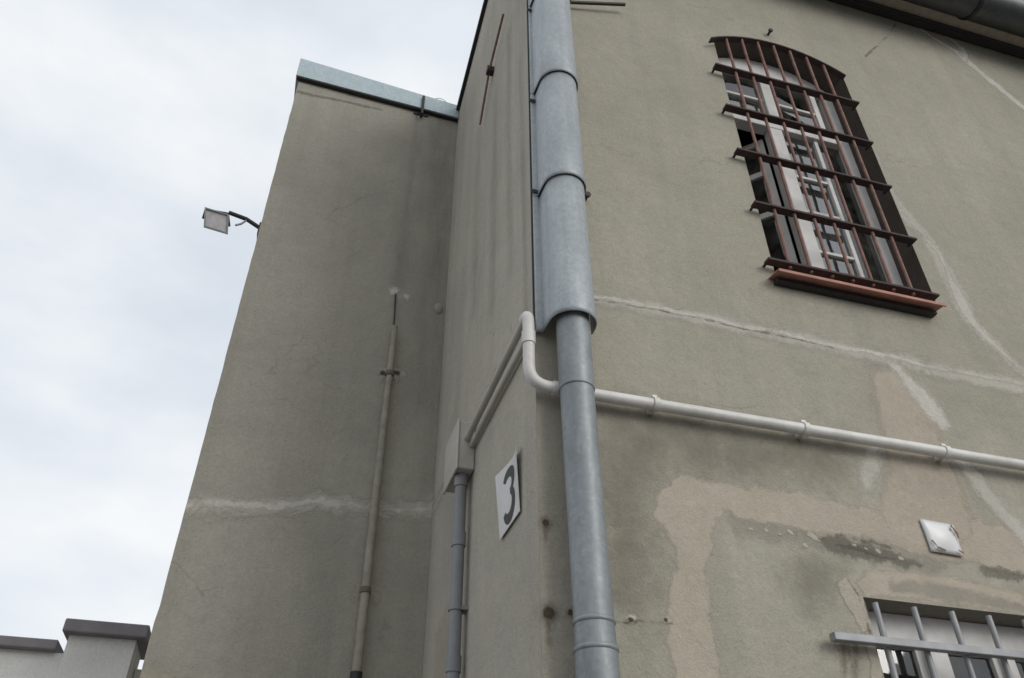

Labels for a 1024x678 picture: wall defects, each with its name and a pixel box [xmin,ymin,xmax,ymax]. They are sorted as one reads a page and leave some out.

crack [594,153,1024,431]
crack [184,491,433,520]
crack [955,460,1024,546]
flaking render [837,577,883,678]